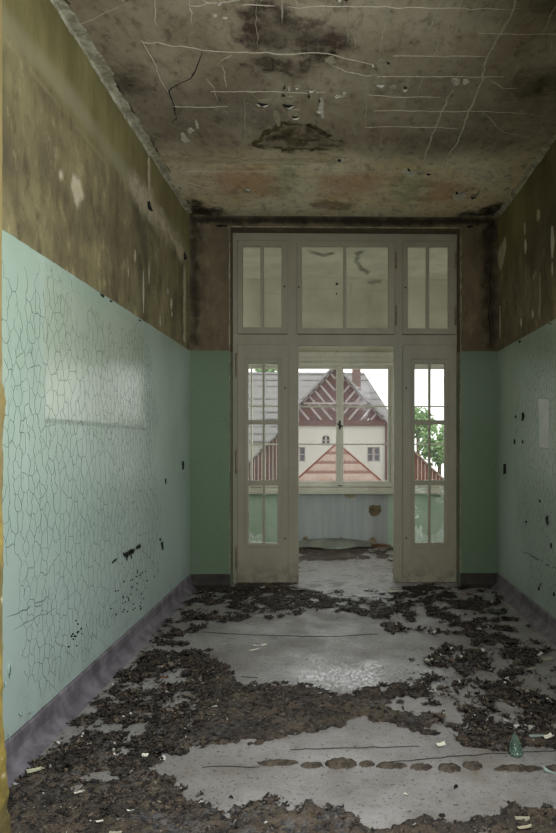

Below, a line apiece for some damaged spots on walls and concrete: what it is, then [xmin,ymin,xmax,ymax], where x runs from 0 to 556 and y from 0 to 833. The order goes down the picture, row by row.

peeling [256,84,324,127]
water stain [238,0,349,76]
water stain [252,122,343,153]
crack [141,0,556,199]
water stain [129,175,507,345]
crack [2,261,162,691]